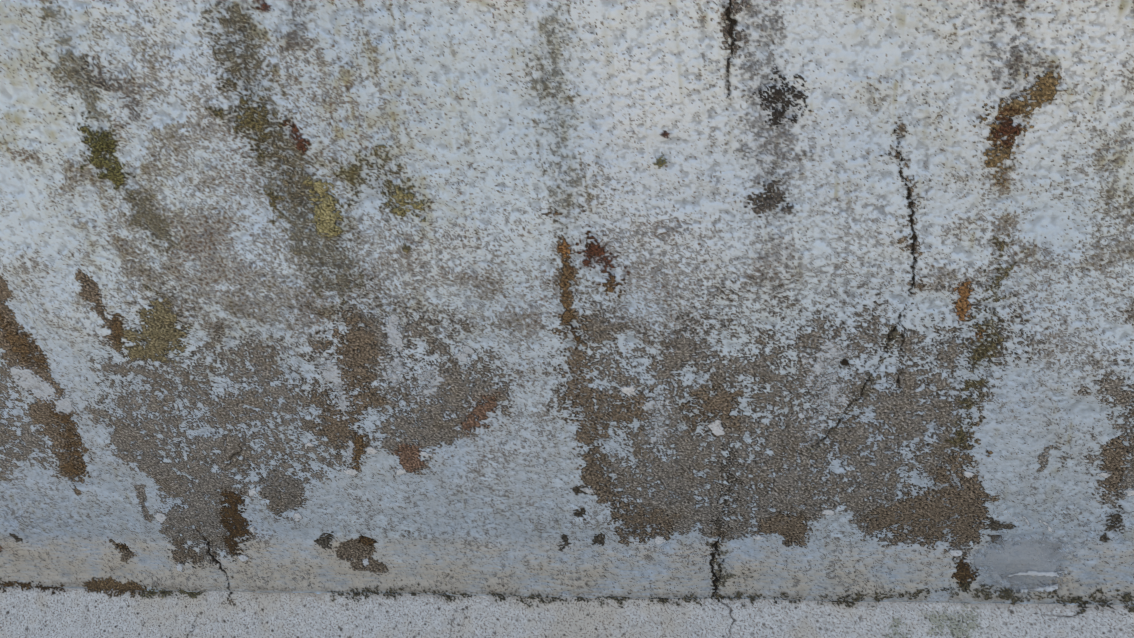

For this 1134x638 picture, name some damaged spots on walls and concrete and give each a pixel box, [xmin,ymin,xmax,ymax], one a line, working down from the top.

damp [28,0,140,145]
damp [204,0,364,303]
damp [532,6,580,101]
crack [718,0,750,97]
rust [973,61,1073,185]
damp [114,180,182,253]
rust [558,206,629,298]
crack [808,117,927,455]
damp [946,235,1016,458]
crack [706,529,736,632]